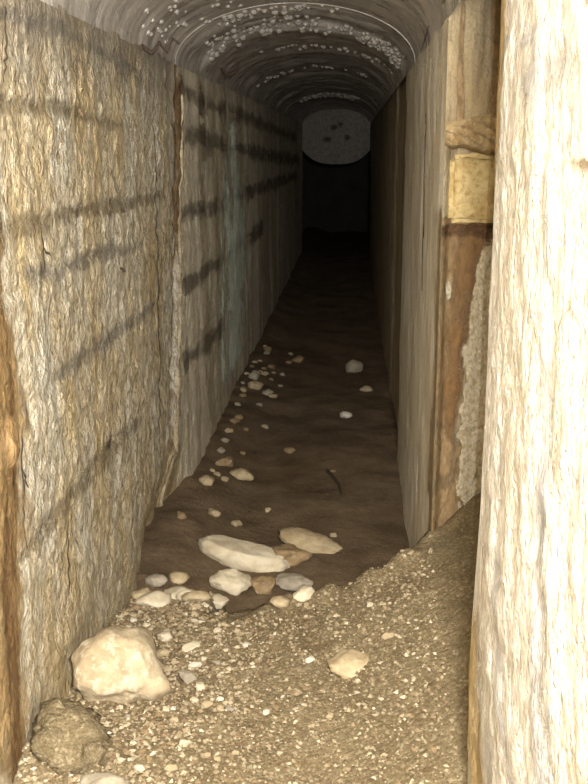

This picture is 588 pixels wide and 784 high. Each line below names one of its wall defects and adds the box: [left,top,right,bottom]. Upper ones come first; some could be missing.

spalling [442,112,497,510]